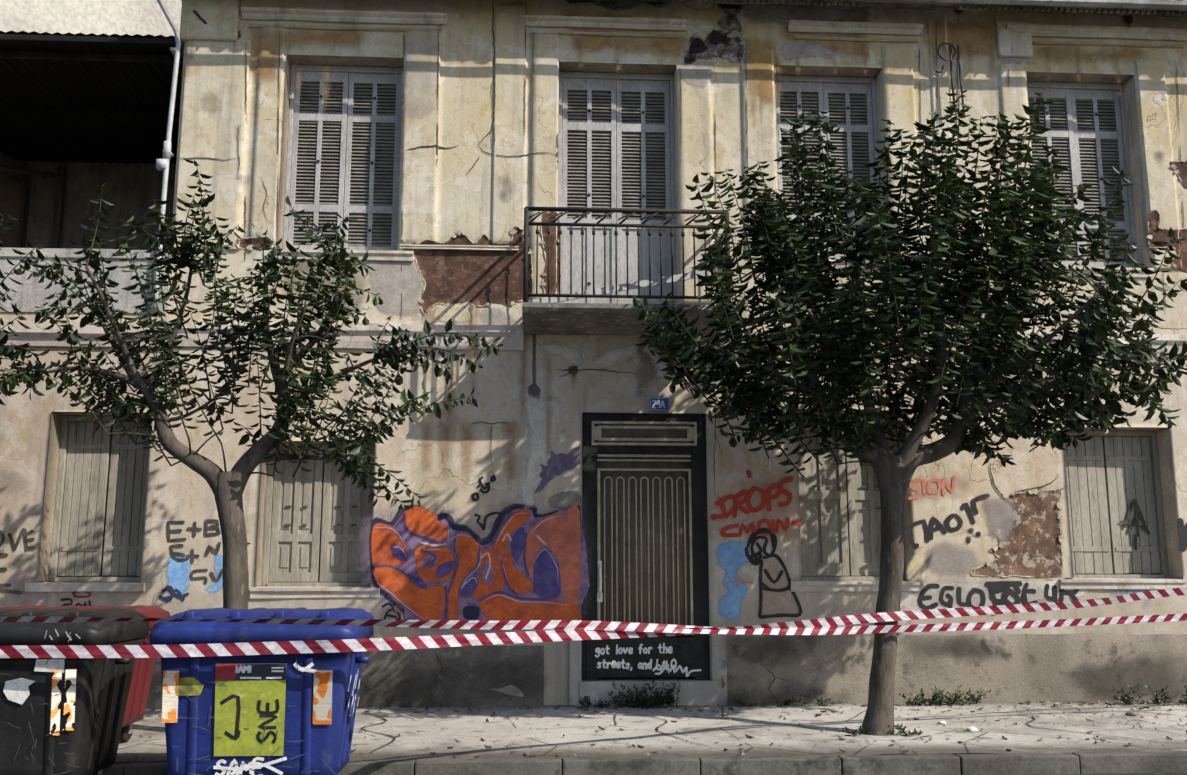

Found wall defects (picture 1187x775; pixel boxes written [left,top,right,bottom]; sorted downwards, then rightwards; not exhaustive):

spalling [683,4,749,64]
crack [406,0,557,174]
damp [746,40,777,106]
spalling [1170,160,1187,188]
spalling [400,211,562,315]
spalling [1146,209,1187,273]
crack [559,369,637,377]
spalling [900,489,1087,611]